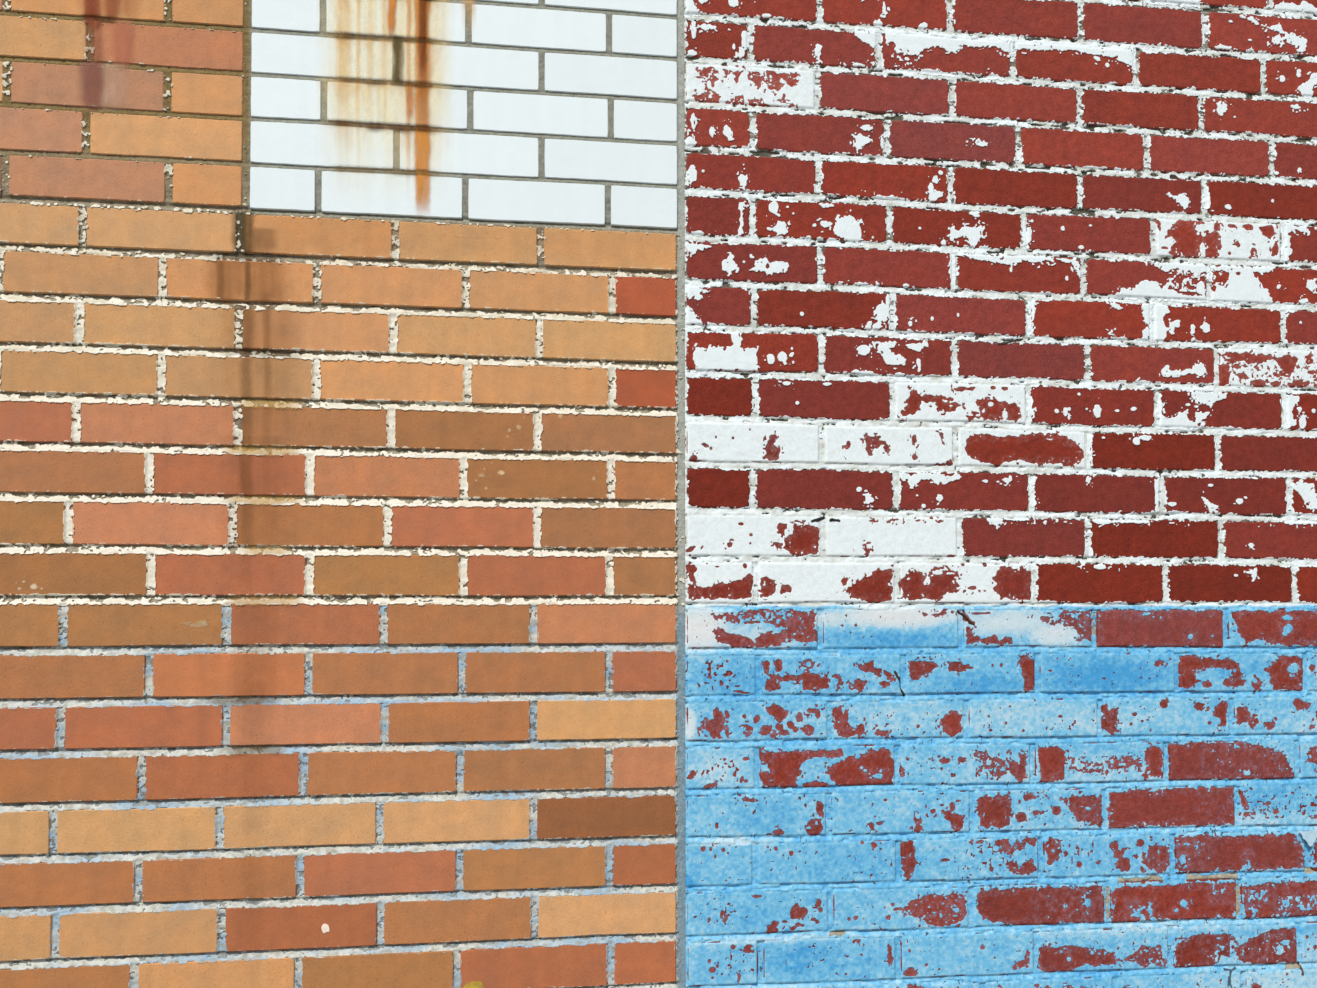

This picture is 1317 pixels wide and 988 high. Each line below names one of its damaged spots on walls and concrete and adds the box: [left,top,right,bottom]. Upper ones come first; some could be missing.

corrosion [334,0,432,203]
peeling [684,0,800,149]
peeling [840,0,1137,81]
peeling [1215,1,1317,113]
peeling [685,285,799,405]
peeling [722,252,789,277]
peeling [805,190,902,246]
peeling [941,208,1084,293]
peeling [1106,178,1317,445]
peeling [823,280,1247,571]
peeling [771,520,820,557]
peeling [686,546,973,856]